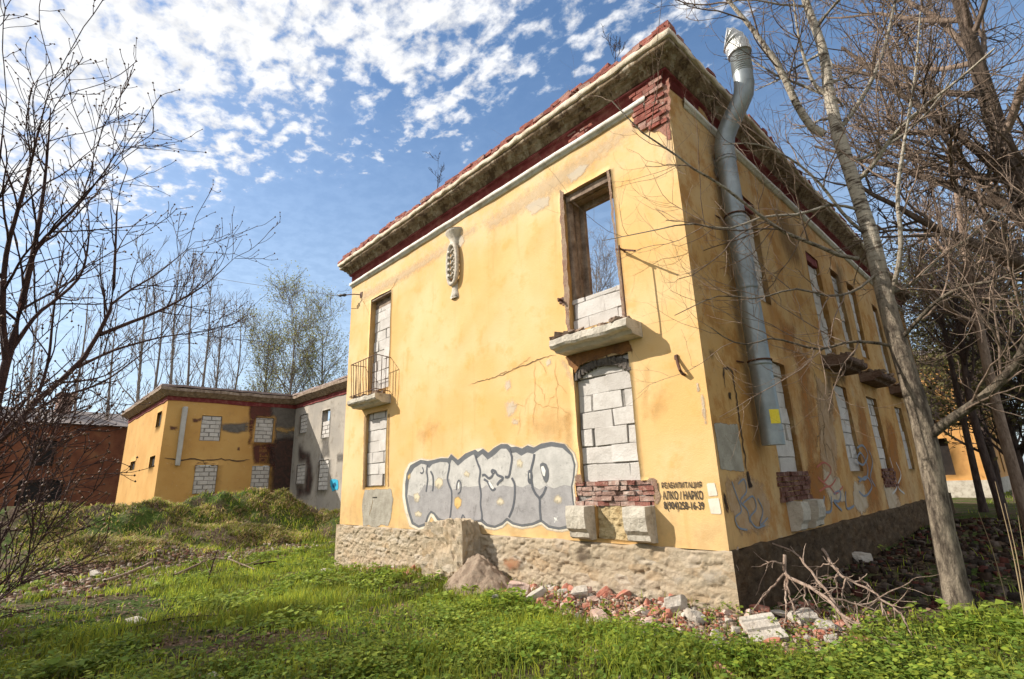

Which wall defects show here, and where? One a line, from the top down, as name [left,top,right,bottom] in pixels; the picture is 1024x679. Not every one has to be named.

flaking render [629,75,671,160]
crack [472,355,569,432]
crack [167,458,248,470]